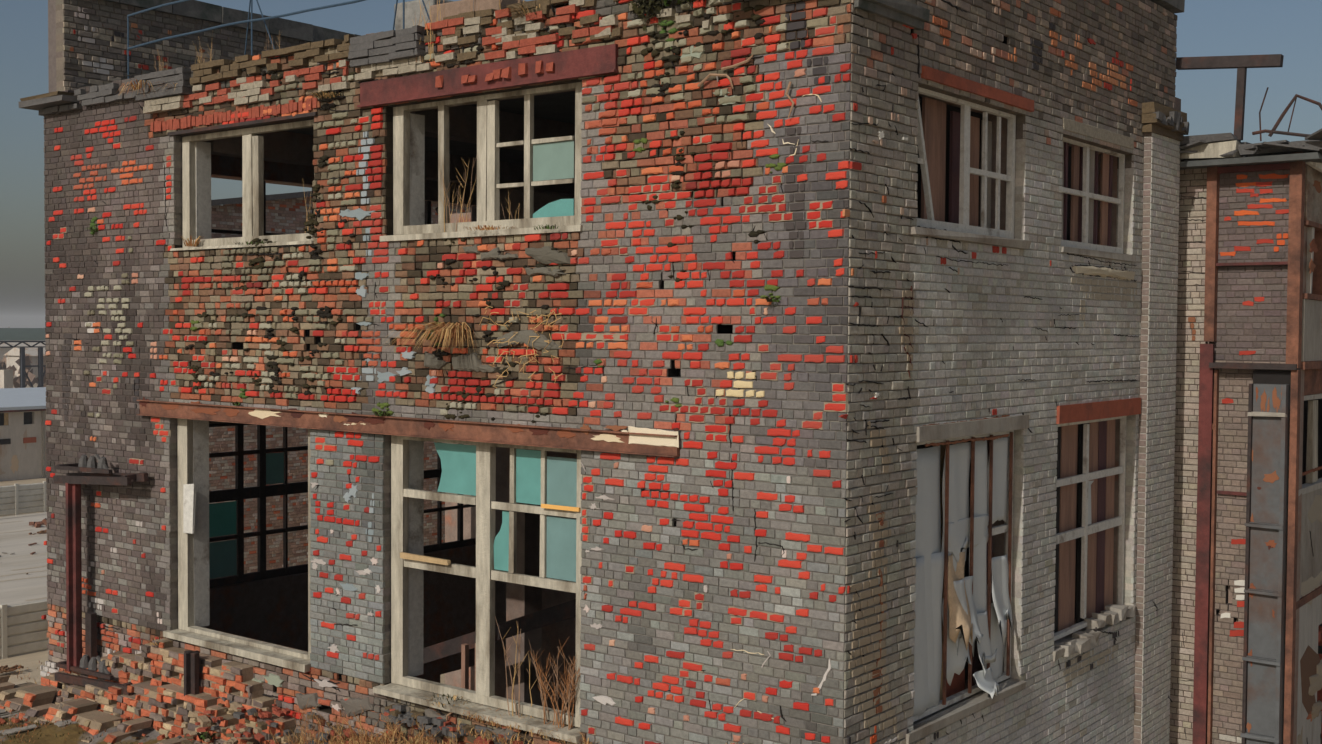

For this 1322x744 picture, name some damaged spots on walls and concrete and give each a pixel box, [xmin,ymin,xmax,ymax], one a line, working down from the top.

peeling [74,3,900,662]
corrosion [1256,387,1282,413]
peeling [306,423,382,711]
peeling [252,673,303,719]
spalling [581,695,652,735]
spalling [607,651,834,744]